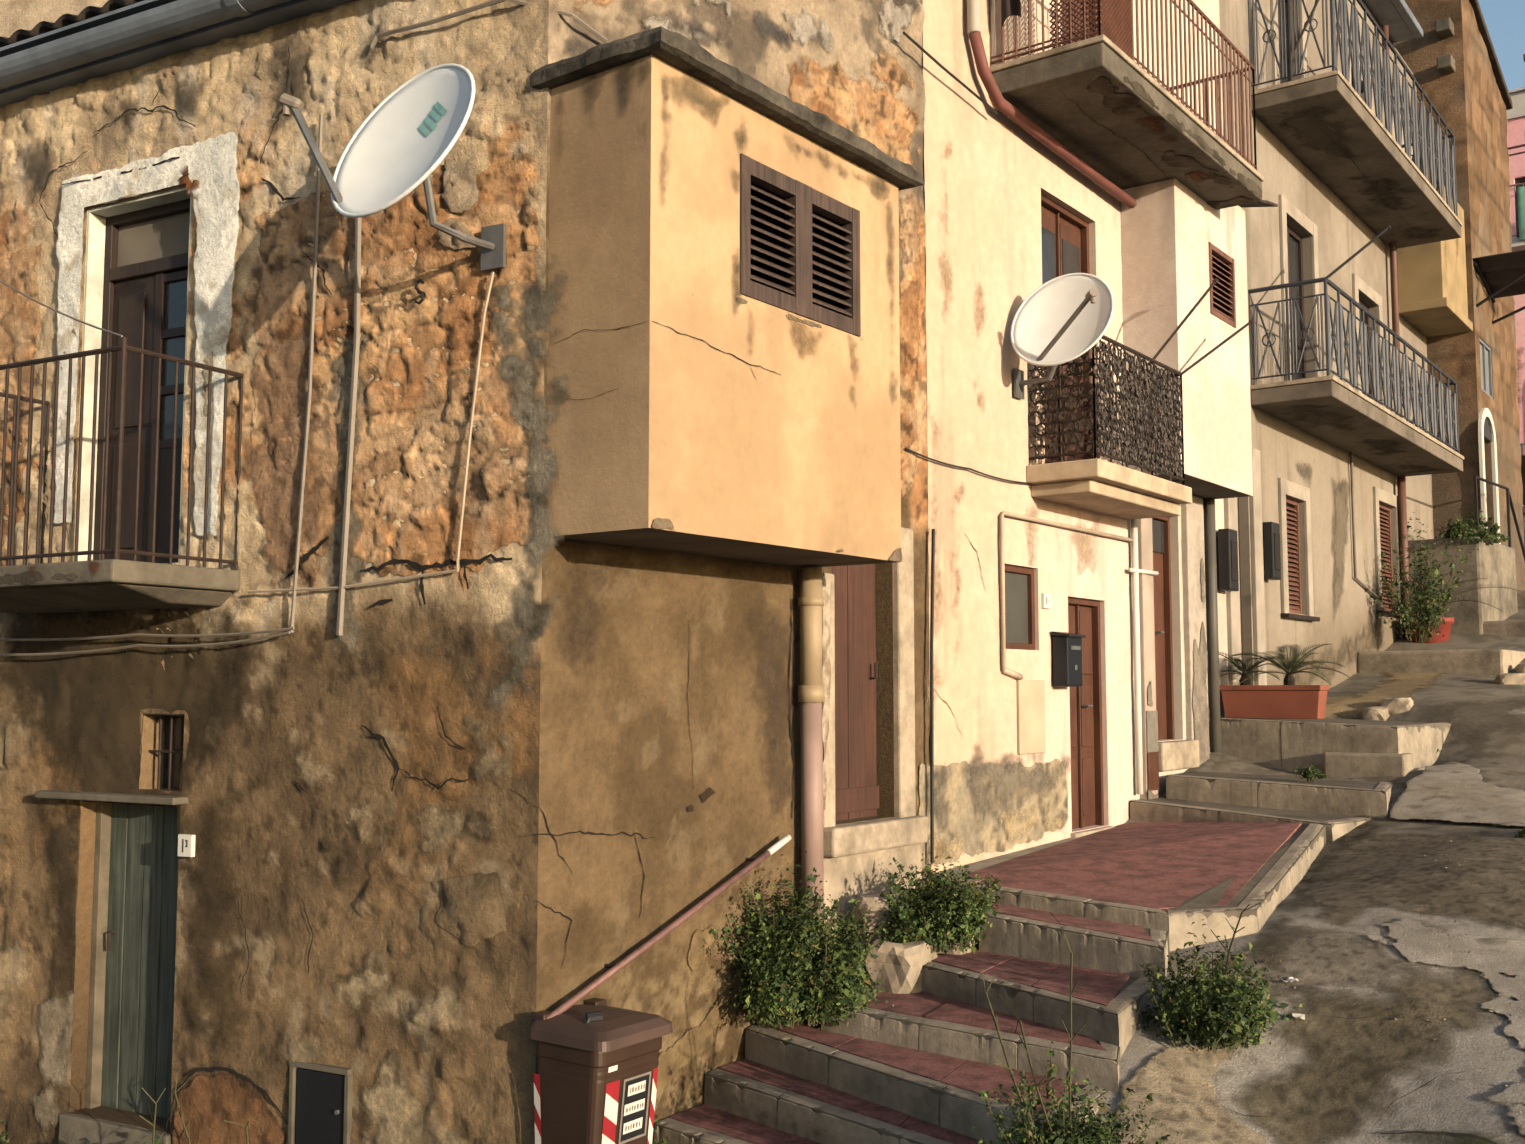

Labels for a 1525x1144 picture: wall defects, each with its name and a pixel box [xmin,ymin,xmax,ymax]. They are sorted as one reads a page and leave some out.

peeling [644,18,707,42]
crack [39,89,195,235]
crack [554,321,781,379]
spalling [0,132,569,706]
crack [284,536,329,579]
crack [359,553,512,608]
peeling [346,800,496,854]
crack [531,784,655,918]
leakage [927,768,949,829]
peeling [919,759,1068,869]
leakage [967,748,1070,816]
spalling [166,1066,288,1144]